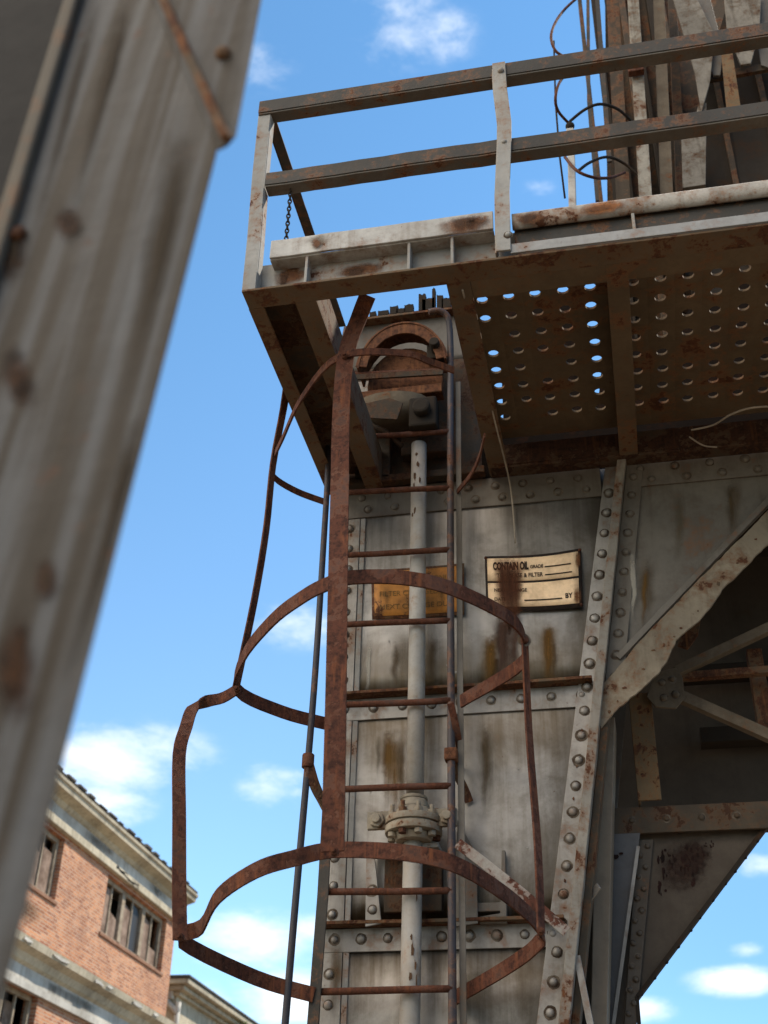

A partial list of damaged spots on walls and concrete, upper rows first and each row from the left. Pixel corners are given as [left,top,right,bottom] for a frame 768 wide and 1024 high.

rust [519,213,541,223]
rust [586,202,623,214]
rust [485,623,519,674]
rust [543,628,555,672]